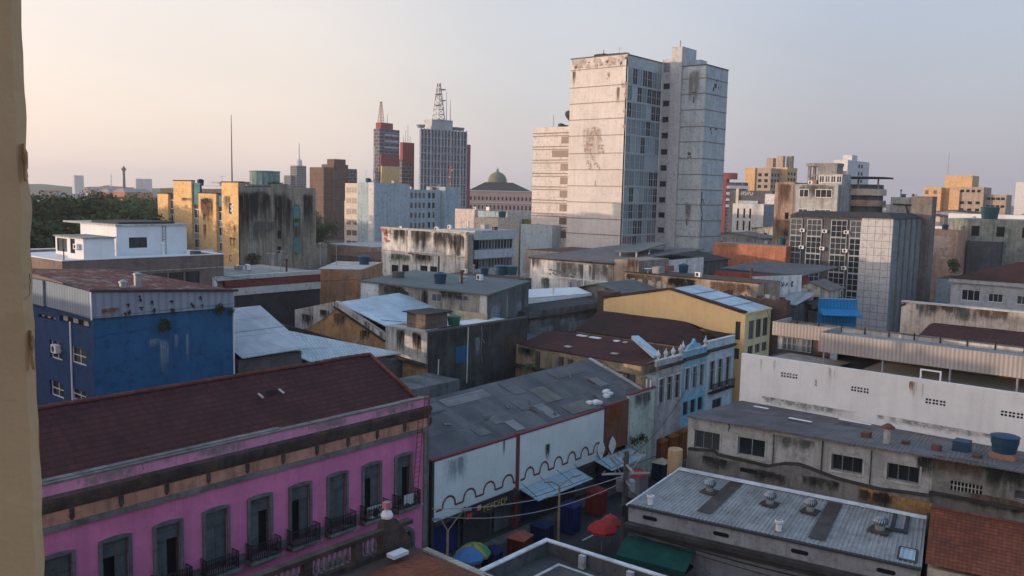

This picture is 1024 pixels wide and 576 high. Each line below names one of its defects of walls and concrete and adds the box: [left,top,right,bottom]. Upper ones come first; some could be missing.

water stain [225,192,312,237]
water stain [391,230,464,262]
water stain [753,469,785,484]
water stain [803,476,839,490]
water stain [860,490,890,507]